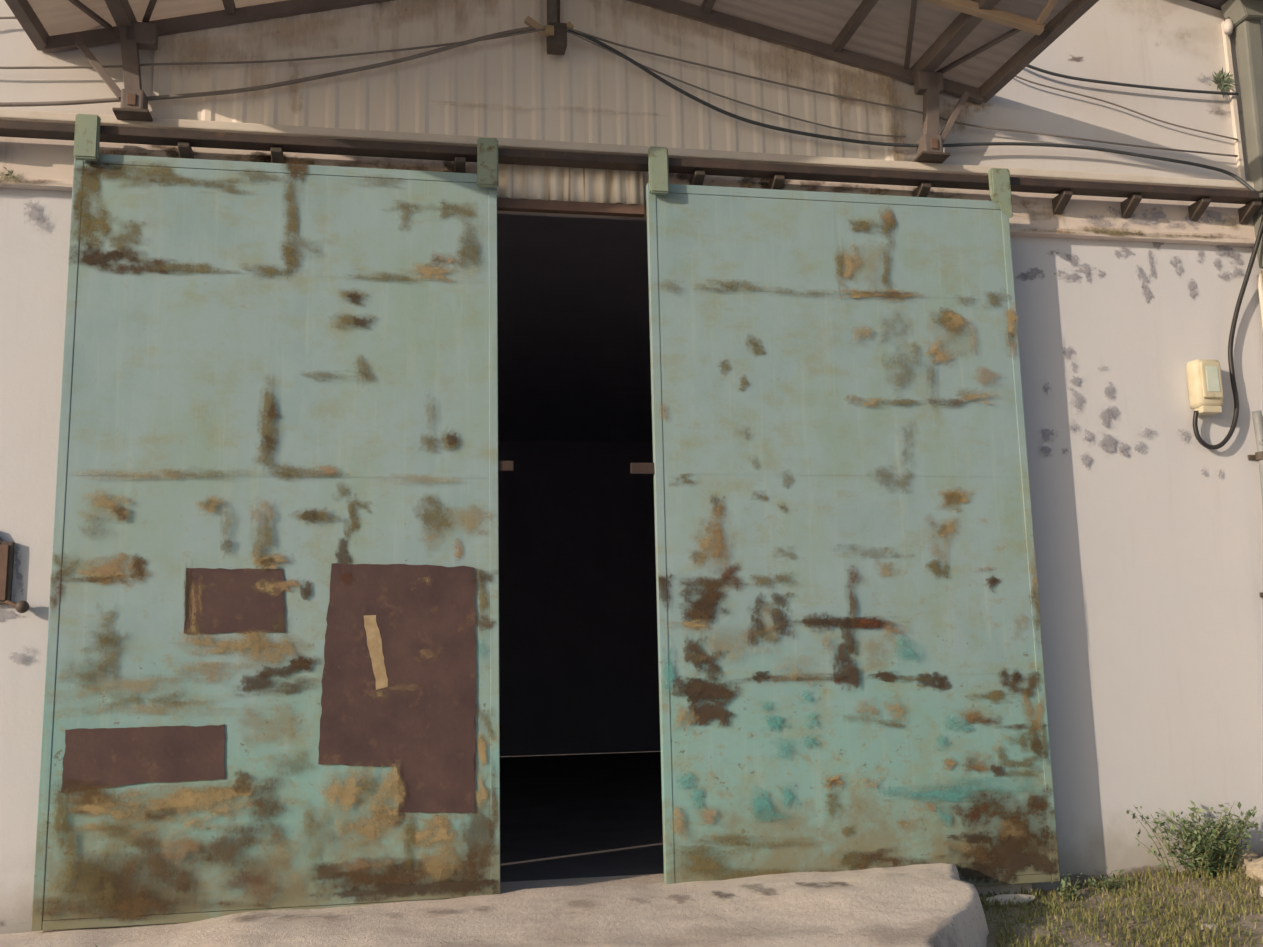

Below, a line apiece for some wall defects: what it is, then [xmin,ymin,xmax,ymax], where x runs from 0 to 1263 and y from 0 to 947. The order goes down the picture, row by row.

corrosion [71,145,239,274]
corrosion [250,152,314,276]
peeling [1022,251,1105,282]
peeling [1115,242,1164,302]
peeling [1170,256,1197,298]
peeling [1198,245,1244,280]
peeling [1069,376,1156,468]
corrosion [658,496,739,726]
corrosion [748,566,906,690]
corrosion [875,672,951,690]
corrosion [313,711,498,902]
corrosion [944,670,1059,884]